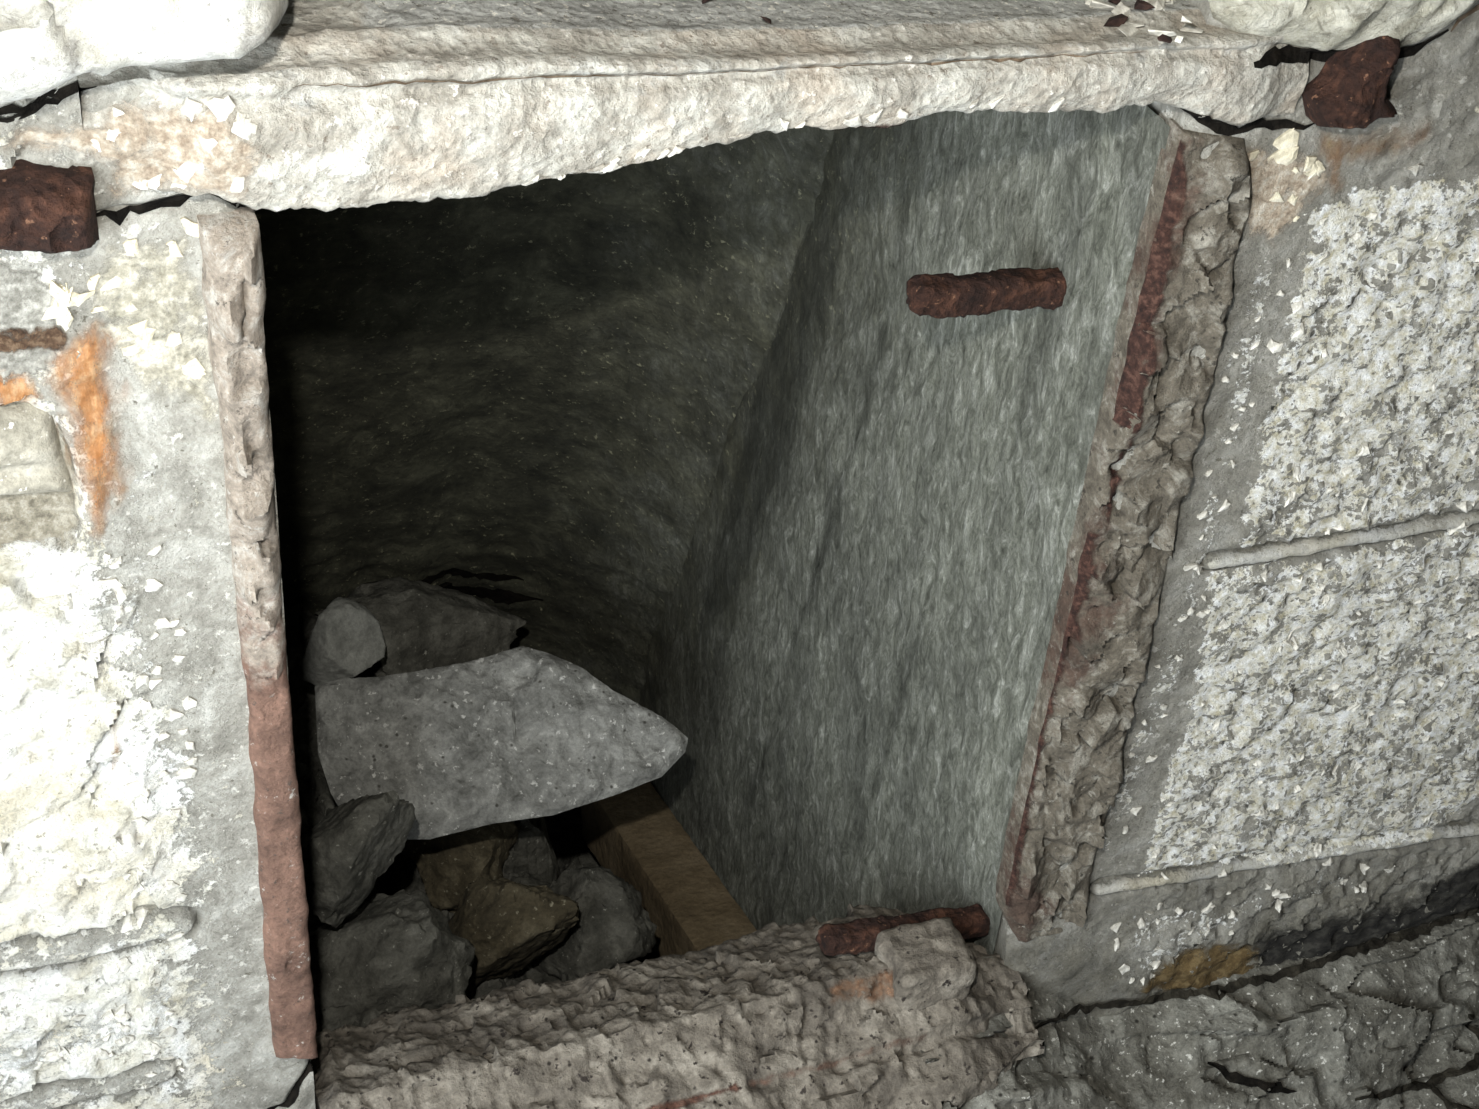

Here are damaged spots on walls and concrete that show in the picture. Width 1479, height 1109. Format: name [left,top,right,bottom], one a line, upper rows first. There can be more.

corrosion [56,335,115,522]
corrosion [1005,141,1187,907]
crack [1015,908,1479,1076]
crack [1207,1062,1297,1094]
damp [1142,864,1479,994]
crack [1355,1014,1479,1109]